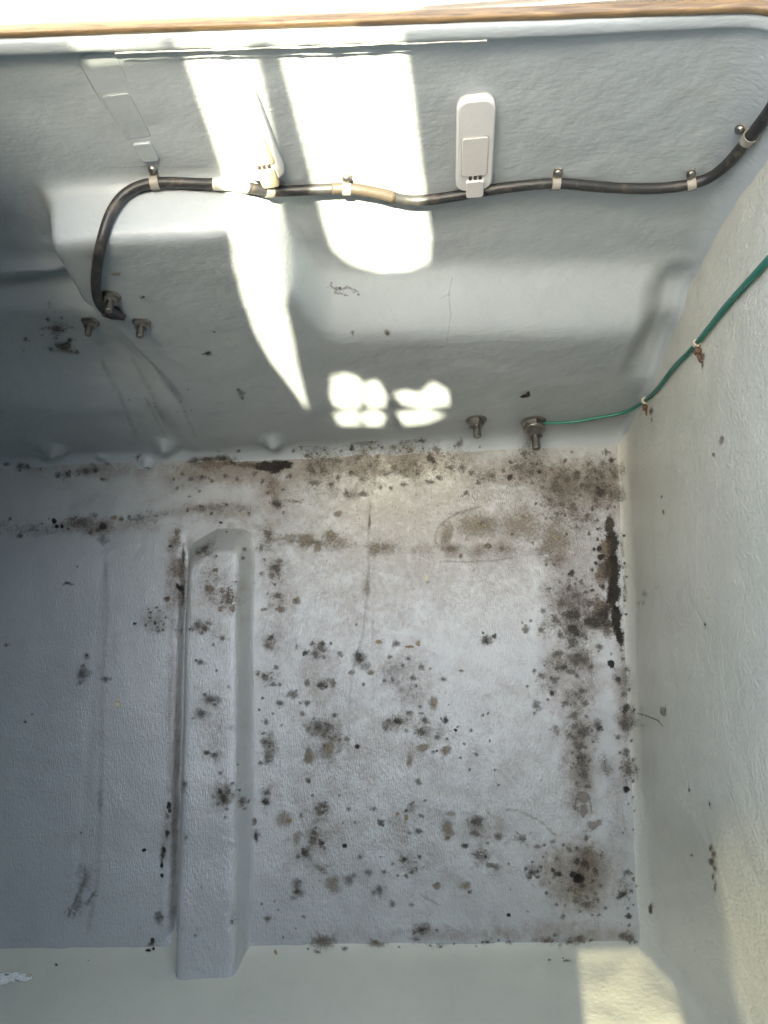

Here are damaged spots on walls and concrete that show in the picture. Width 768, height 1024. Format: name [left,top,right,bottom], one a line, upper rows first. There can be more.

water stain [8,511,166,538]
water stain [134,529,240,632]
water stain [173,437,638,811]
water stain [160,802,172,878]
water stain [212,772,269,840]
water stain [294,779,328,862]
water stain [307,925,347,953]
water stain [317,856,425,890]
water stain [443,812,454,839]
water stain [462,815,510,869]
water stain [517,832,607,918]
water stain [617,870,637,944]